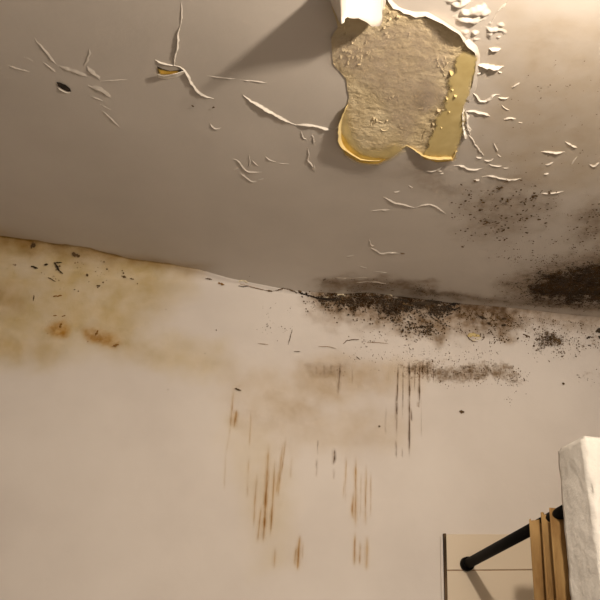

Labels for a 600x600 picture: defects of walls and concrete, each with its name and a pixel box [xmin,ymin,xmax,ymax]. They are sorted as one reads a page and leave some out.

peeling [330,0,507,174]
damp [451,180,600,312]
damp [301,277,600,398]